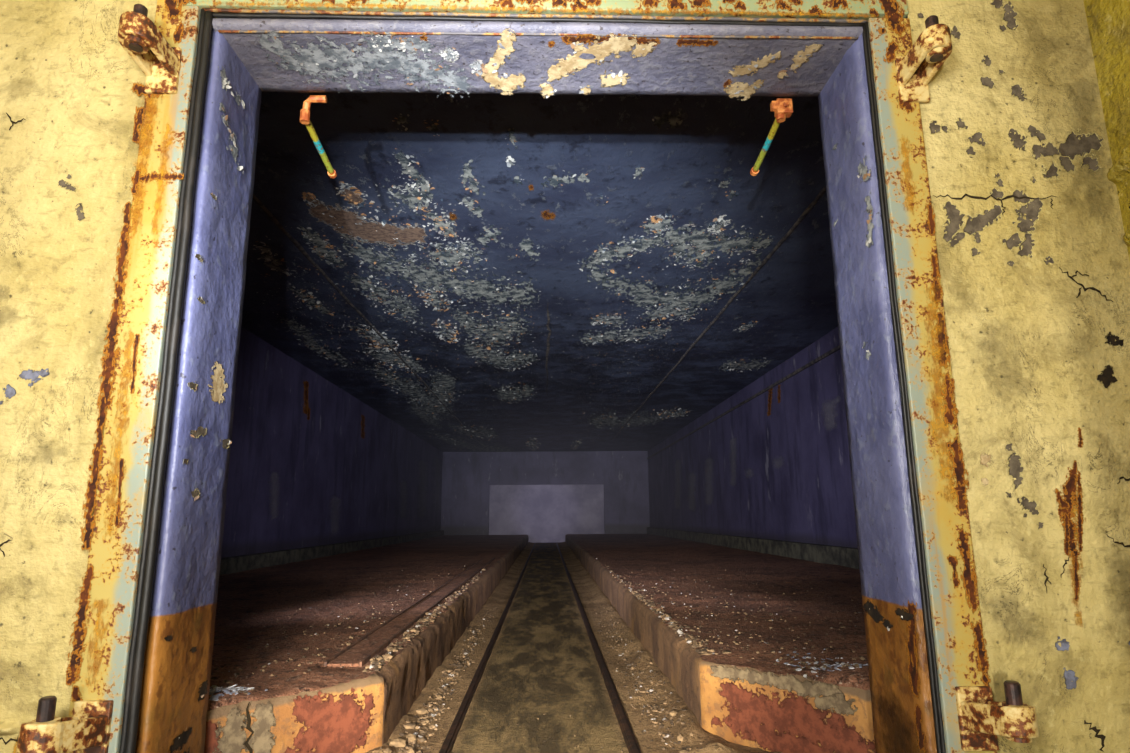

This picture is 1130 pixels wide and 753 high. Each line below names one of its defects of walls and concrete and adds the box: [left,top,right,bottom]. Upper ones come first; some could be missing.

peeling [256,28,526,97]
rust [214,0,909,63]
peeling [540,31,657,98]
peeling [723,44,823,101]
crack [933,193,1056,215]
peeling [942,125,1104,267]
rust [66,82,184,702]
peeling [251,148,553,433]
peeling [555,213,779,438]
rust [927,254,969,511]
rust [947,526,991,686]
rust [1055,427,1086,626]